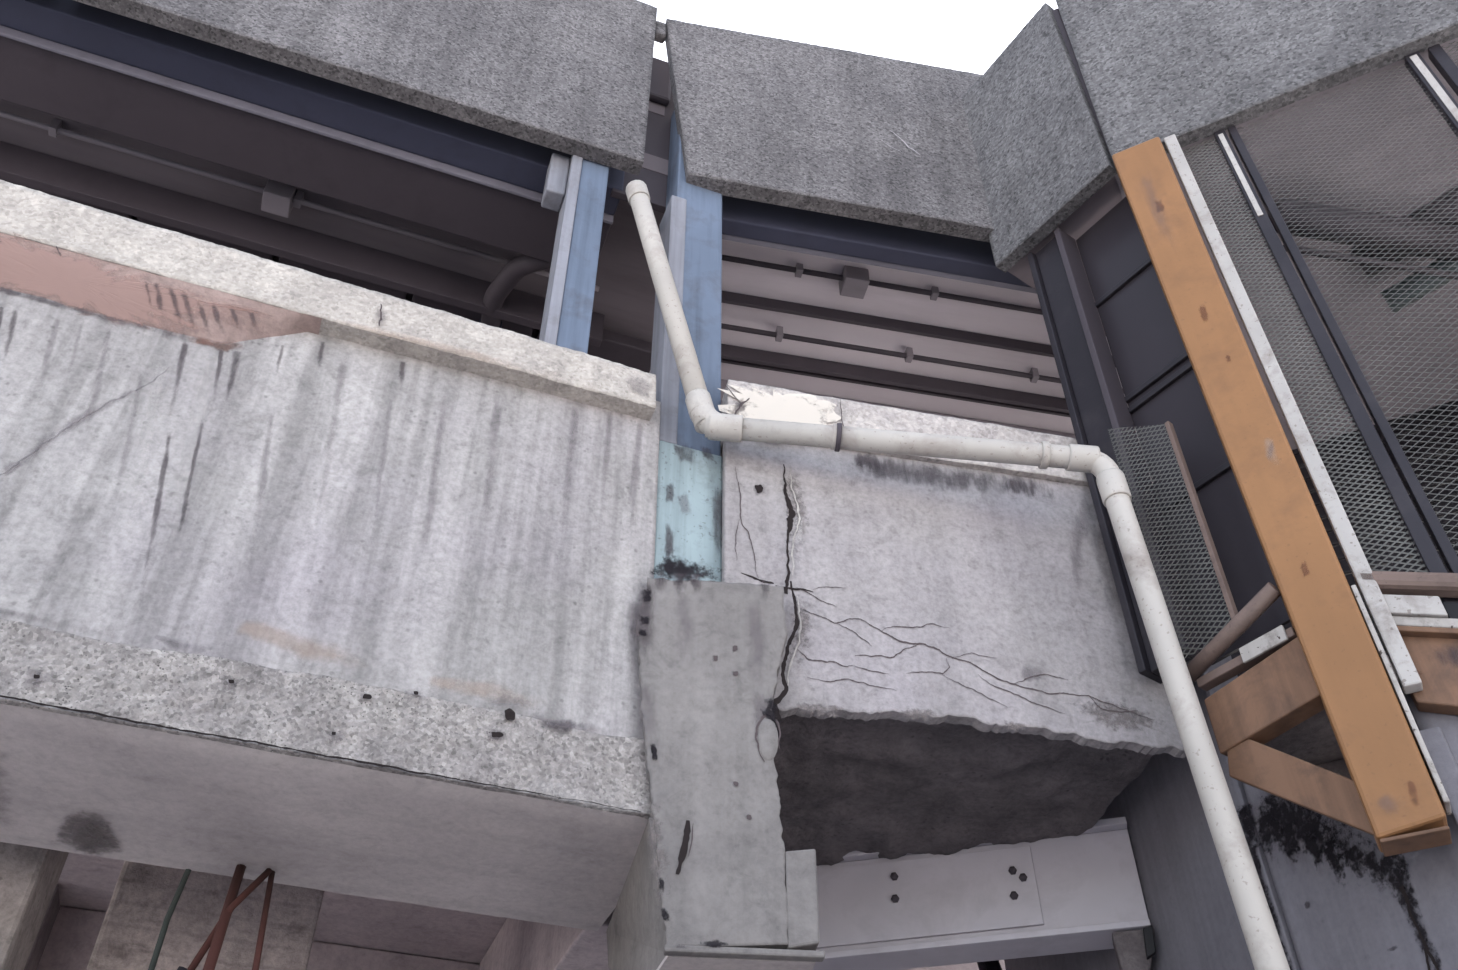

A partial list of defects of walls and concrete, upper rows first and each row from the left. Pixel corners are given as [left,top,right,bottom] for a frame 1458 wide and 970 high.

damp [154,437,169,524]
damp [183,435,200,514]
damp [635,556,721,640]
crack [735,464,1149,719]
damp [1238,794,1441,970]